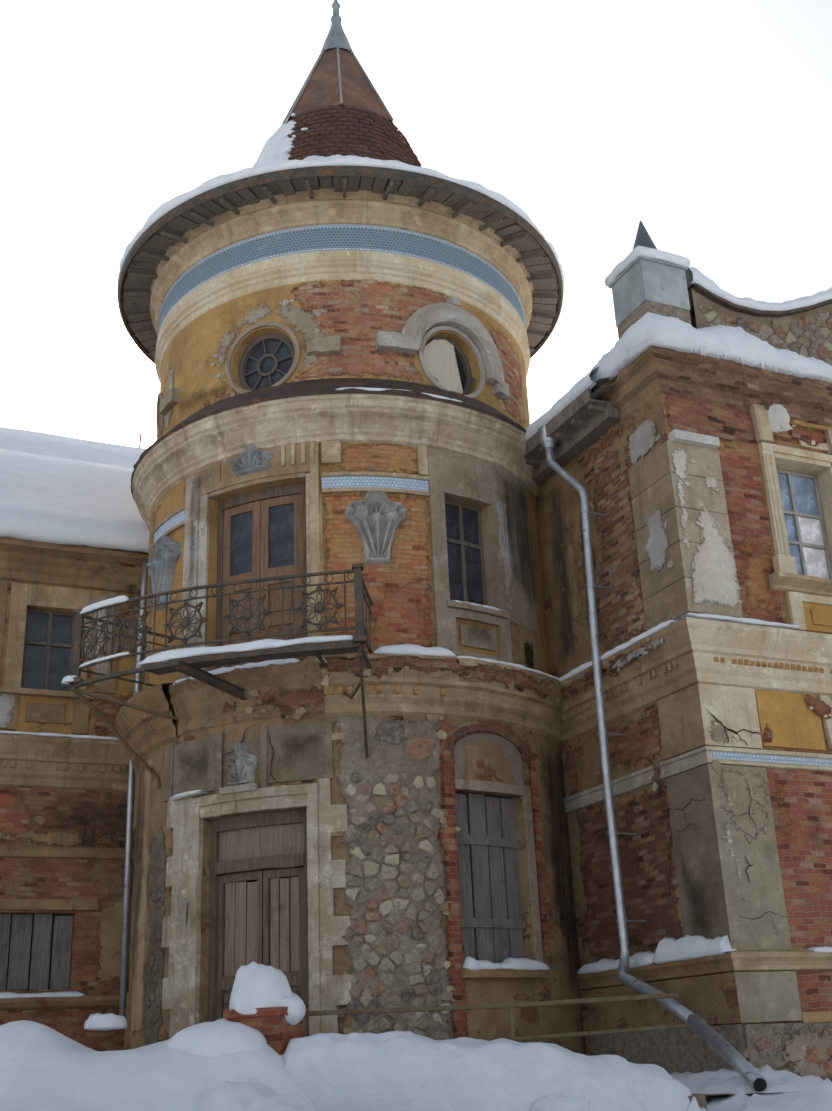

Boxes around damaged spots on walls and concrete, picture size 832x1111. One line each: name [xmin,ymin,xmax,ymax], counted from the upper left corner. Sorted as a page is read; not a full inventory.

flaking render [200,279,448,409]
flaking render [561,394,757,672]
peeling [0,693,15,728]
crack [707,710,761,745]
flaking render [805,694,832,720]
crack [739,777,762,828]